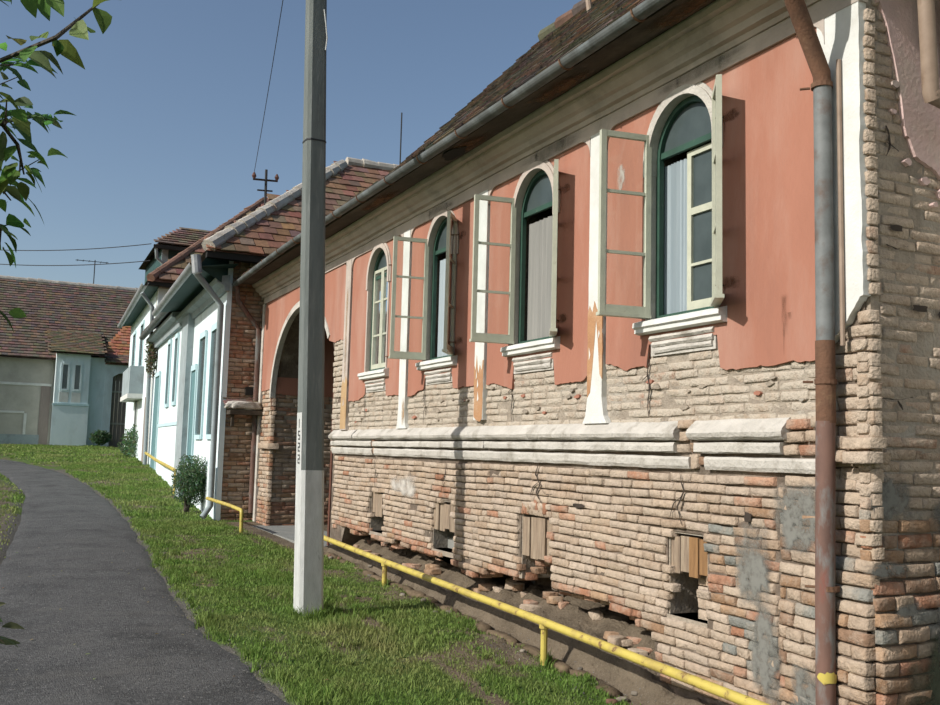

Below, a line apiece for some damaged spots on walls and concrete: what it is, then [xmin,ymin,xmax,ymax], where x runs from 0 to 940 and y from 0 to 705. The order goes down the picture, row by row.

flaking render [835,0,940,521]
flaking render [256,389,298,526]
flaking render [324,301,816,525]
crack [670,475,684,525]